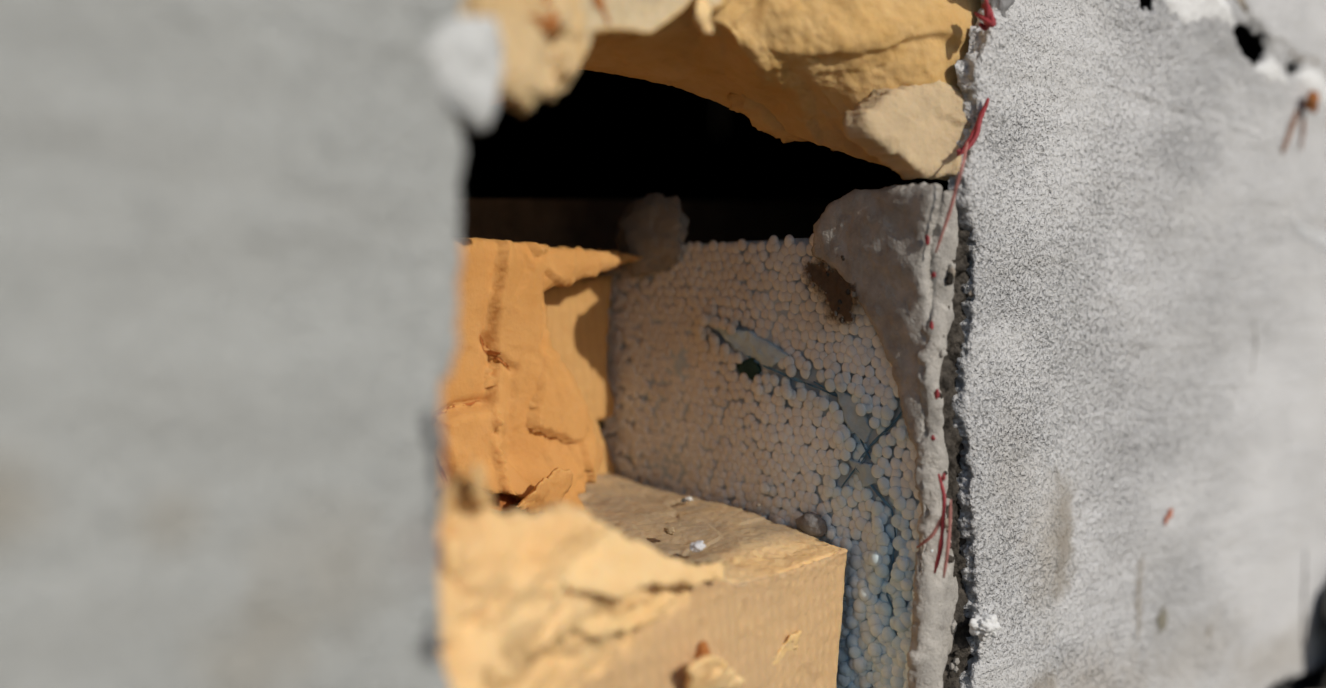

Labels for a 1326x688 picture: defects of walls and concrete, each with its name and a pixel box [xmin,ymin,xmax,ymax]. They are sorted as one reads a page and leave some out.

peeling [424,16,504,131]
crack [1140,0,1326,108]
spalling [736,358,762,380]
spalling [969,611,1002,641]
peeling [685,640,745,688]